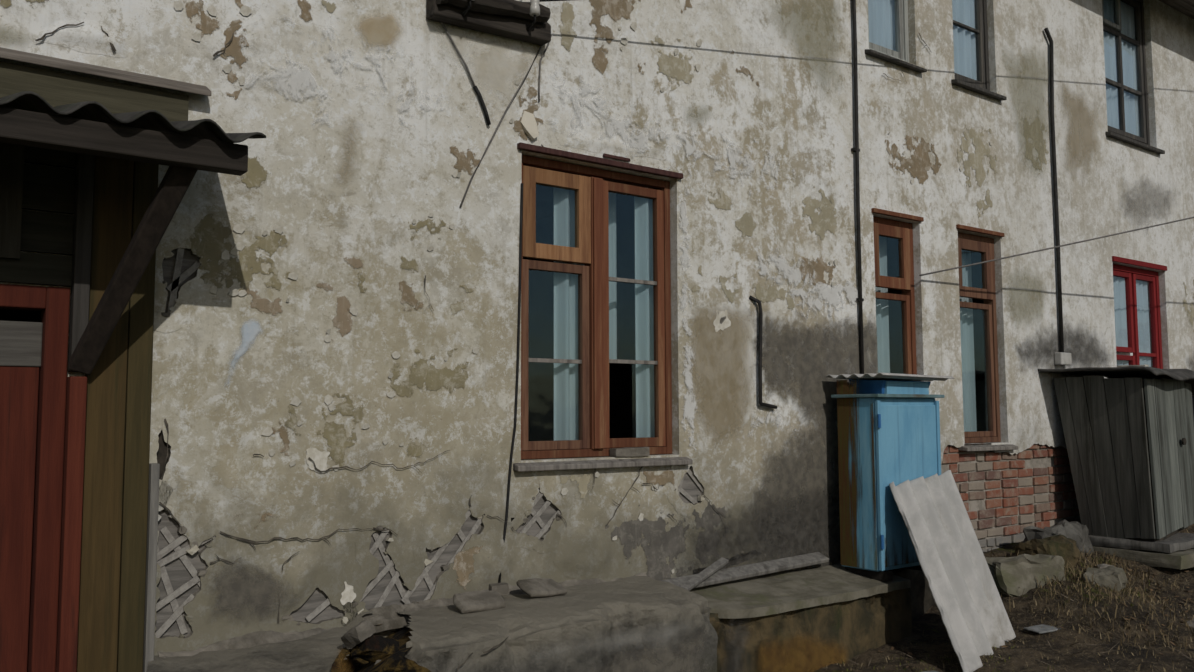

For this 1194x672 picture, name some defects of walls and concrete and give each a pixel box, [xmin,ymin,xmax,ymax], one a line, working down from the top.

peeling [174,0,252,100]
peeling [589,0,641,74]
peeling [638,35,702,92]
damp [553,77,780,194]
peeling [885,132,941,184]
flaking render [154,214,298,333]
flaking render [149,402,239,656]
crack [210,527,397,623]
crack [308,450,449,472]
flaking render [258,472,600,672]
damp [679,247,878,570]
flaking render [940,425,1082,552]